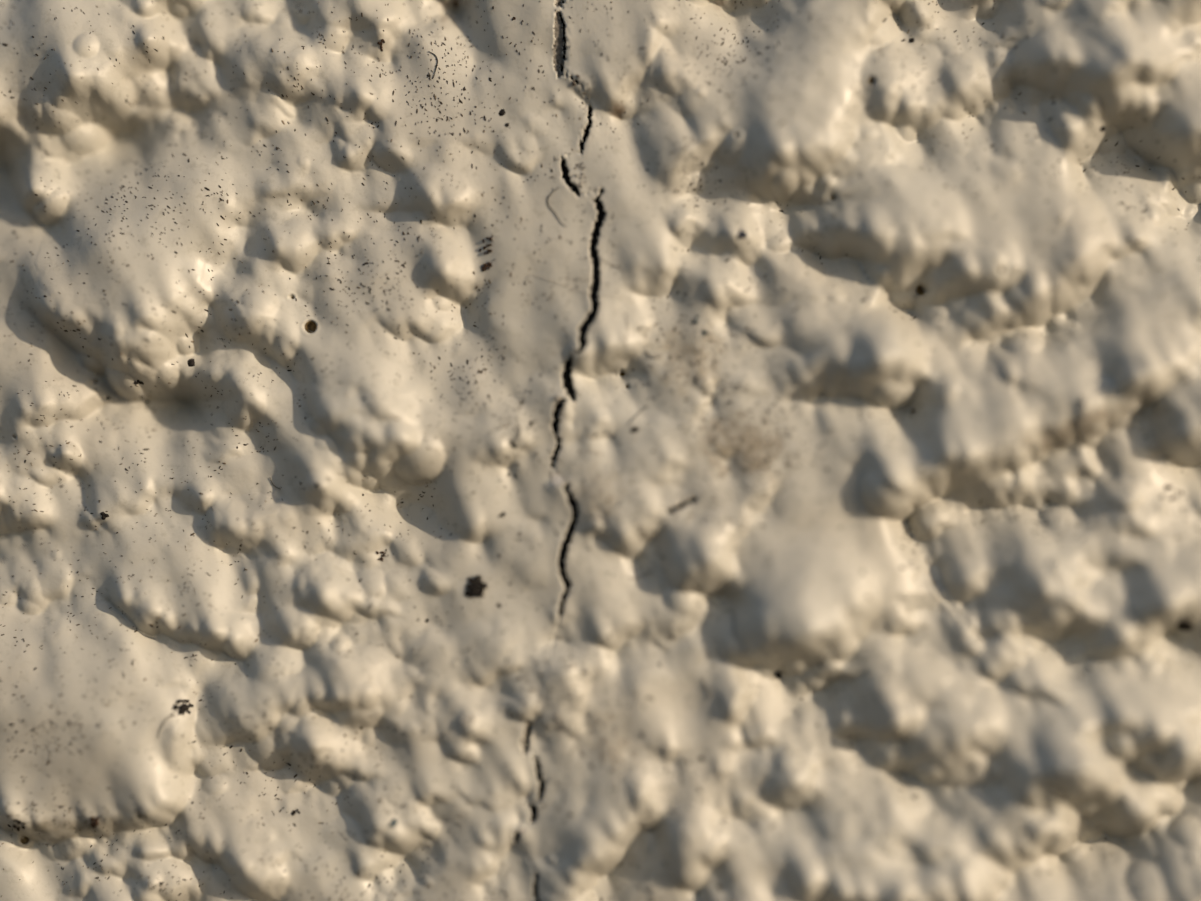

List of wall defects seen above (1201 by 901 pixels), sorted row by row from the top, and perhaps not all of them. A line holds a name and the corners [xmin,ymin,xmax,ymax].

crack [551,0,606,616]
crack [514,720,546,841]
crack [532,873,540,901]